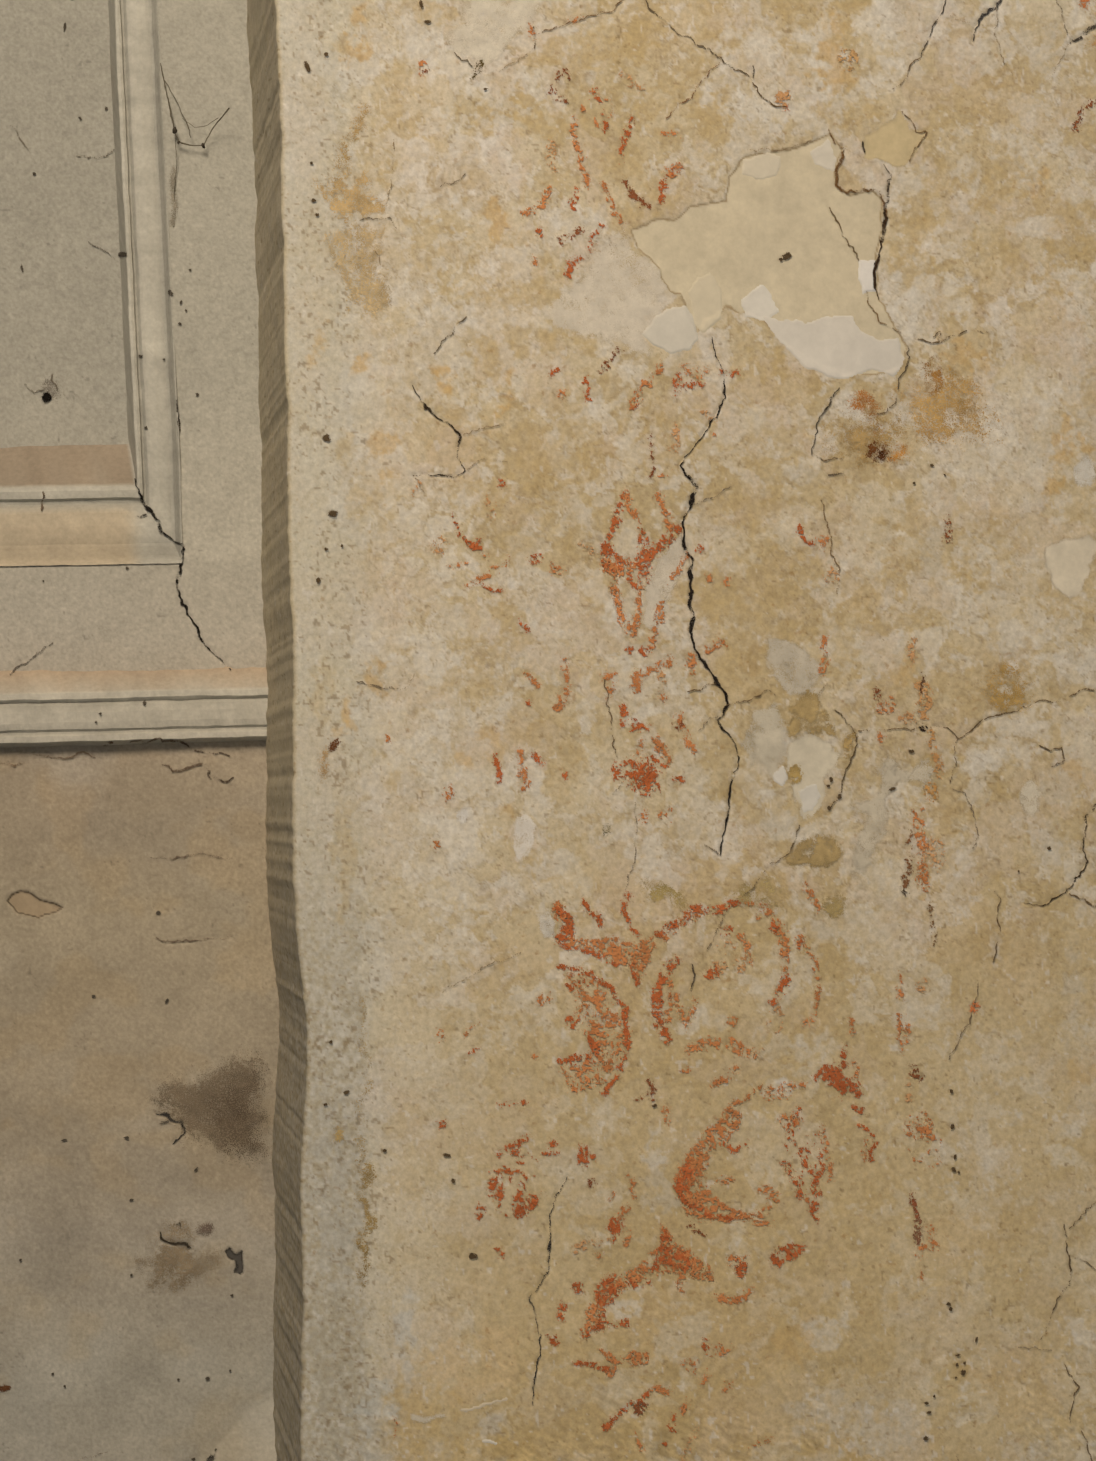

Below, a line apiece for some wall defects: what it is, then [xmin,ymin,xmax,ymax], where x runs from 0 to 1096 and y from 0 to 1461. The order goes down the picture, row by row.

crack [454,0,787,119]
crack [1054,0,1096,73]
flaking render [630,133,909,379]
crack [134,478,231,670]
crack [679,338,774,856]
peeling [741,636,842,821]
crack [818,685,1094,849]
crack [690,825,800,992]
crack [949,804,1096,1060]
crack [1018,1203,1096,1461]